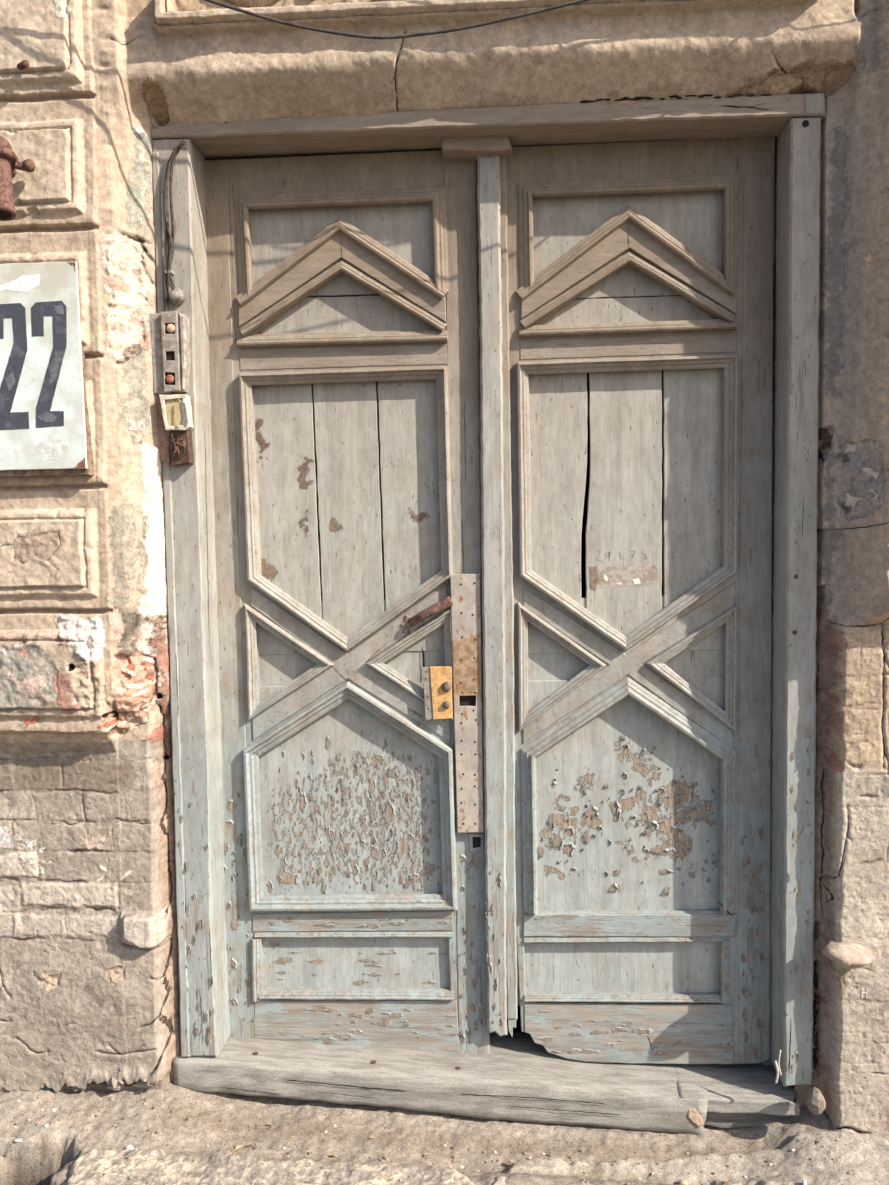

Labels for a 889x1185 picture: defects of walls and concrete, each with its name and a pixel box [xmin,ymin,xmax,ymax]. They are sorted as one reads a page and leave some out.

crack [392,31,406,111]
flaking render [818,428,887,520]
peeling [0,631,82,727]
crack [99,692,173,1077]
peeling [267,736,440,894]
peeling [538,736,717,896]